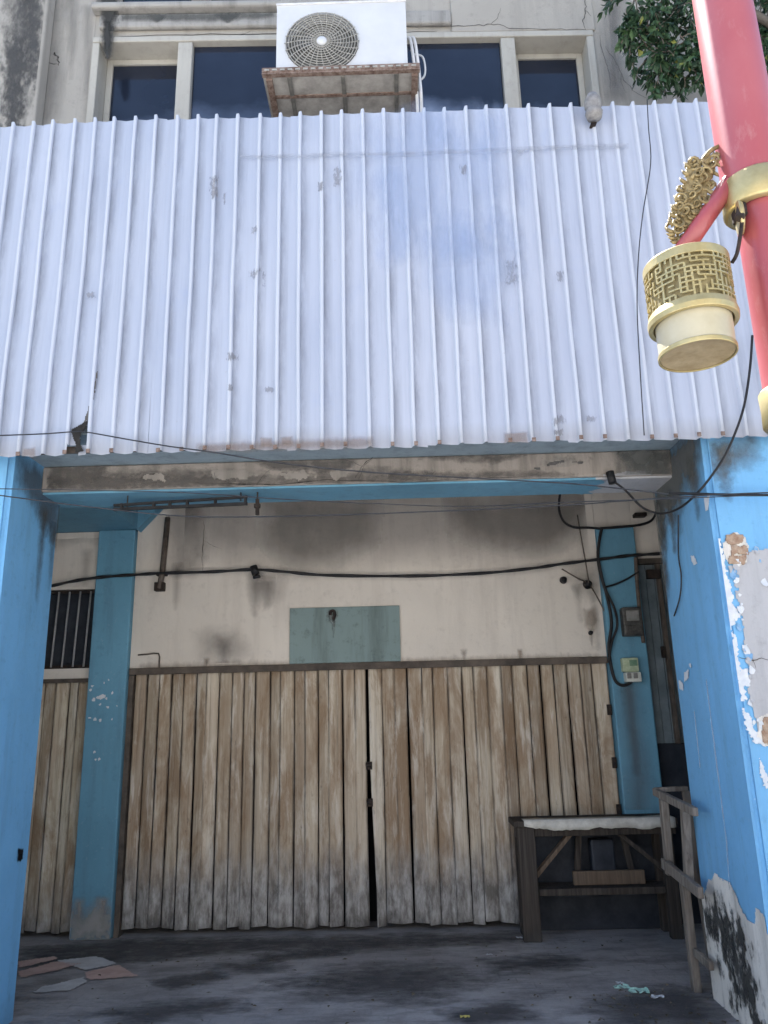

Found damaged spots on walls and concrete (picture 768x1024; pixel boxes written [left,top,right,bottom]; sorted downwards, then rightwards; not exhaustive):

damp [1,0,40,127]
crack [196,29,277,37]
crack [406,0,646,98]
damp [24,454,545,559]
flaking render [718,532,768,788]
damp [703,892,762,1024]
peeling [702,873,768,1024]